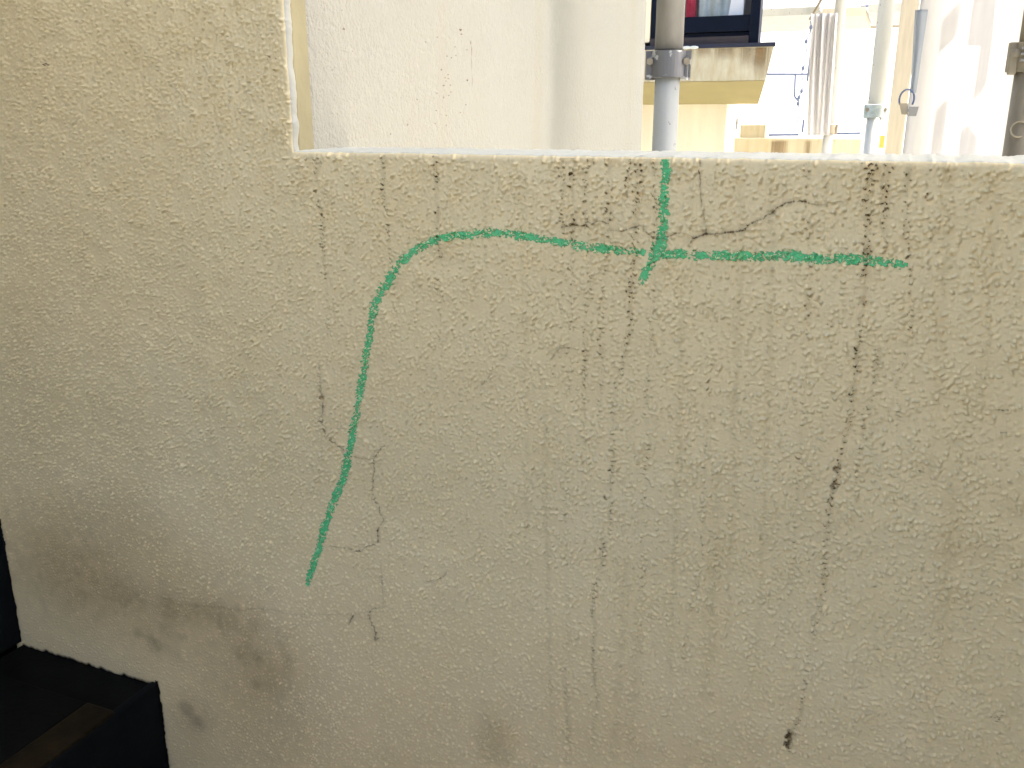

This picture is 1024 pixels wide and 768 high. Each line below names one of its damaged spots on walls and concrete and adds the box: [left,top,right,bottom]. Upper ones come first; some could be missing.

crack [667,200,807,239]
damp [862,163,893,276]